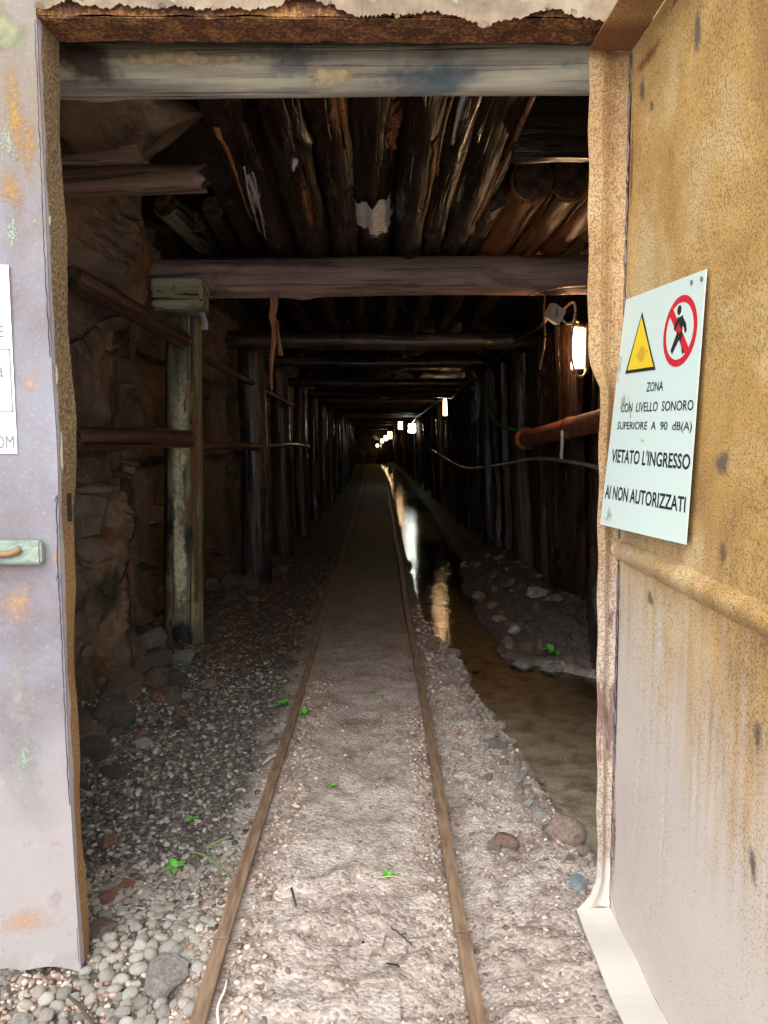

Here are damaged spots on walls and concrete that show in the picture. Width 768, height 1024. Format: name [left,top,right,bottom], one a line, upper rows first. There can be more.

peeling [35,0,290,12]
peeling [315,0,617,28]